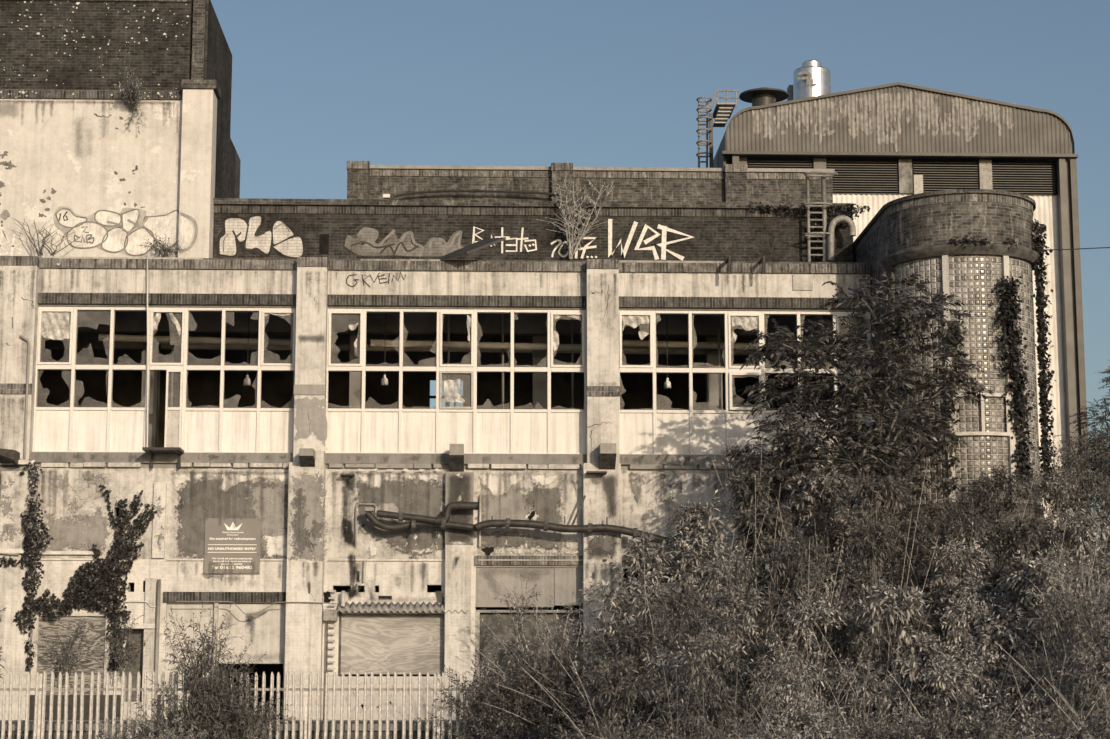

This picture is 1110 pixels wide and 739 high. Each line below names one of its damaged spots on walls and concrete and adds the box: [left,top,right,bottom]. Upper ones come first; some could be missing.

peeling [752,91,1015,152]
peeling [298,435,328,452]
peeling [357,468,442,504]
peeling [477,473,583,497]
peeling [310,520,325,545]
peeling [405,528,464,555]
peeling [478,536,602,556]